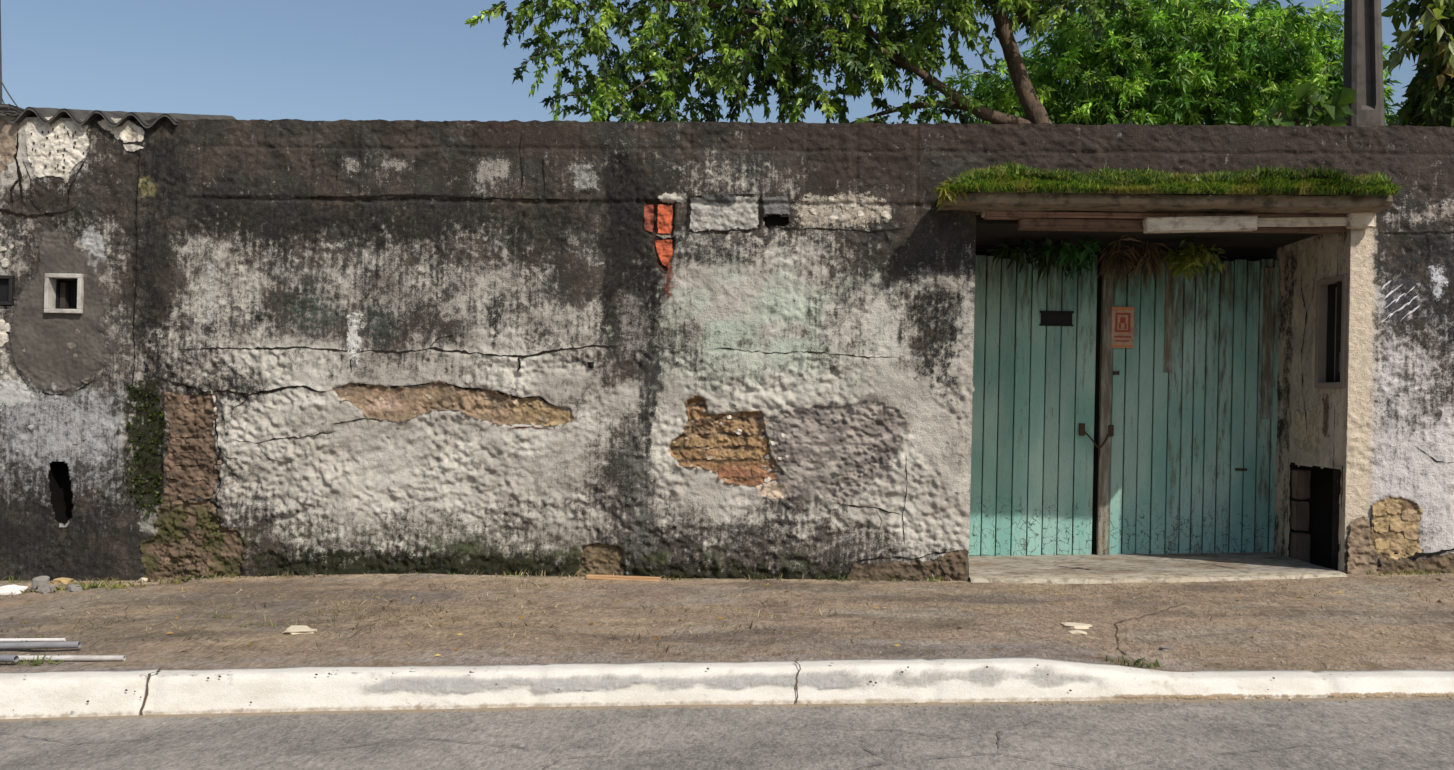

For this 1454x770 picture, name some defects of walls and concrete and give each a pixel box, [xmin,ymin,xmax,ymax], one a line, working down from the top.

crack [0,123,85,218]
peeling [0,104,144,184]
damp [0,469,131,581]
flaking render [136,392,246,580]
flaking render [331,380,575,428]
crack [17,121,906,529]
damp [134,126,909,578]
flaking render [642,193,686,273]
flaking render [669,395,911,507]
damp [898,284,967,406]
flaking render [1347,496,1454,574]
damp [1384,199,1454,356]